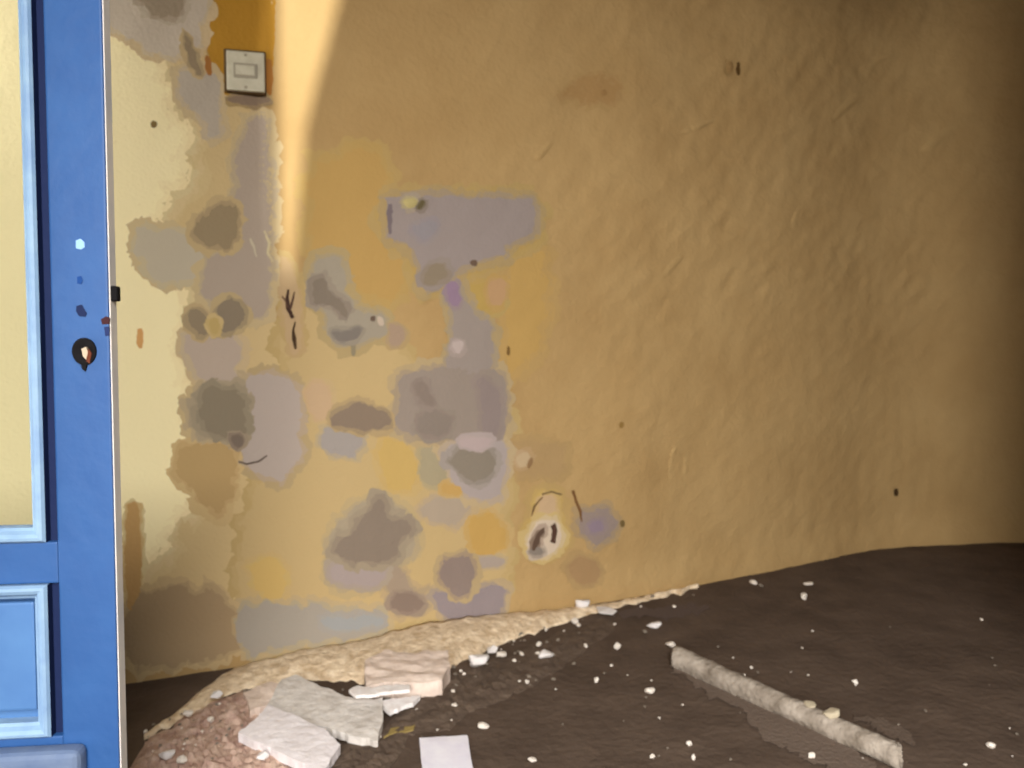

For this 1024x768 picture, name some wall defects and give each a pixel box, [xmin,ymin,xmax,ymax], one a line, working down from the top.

flaking render [109,0,395,492]
crack [282,289,297,349]
flaking render [377,184,547,374]
crack [239,455,267,465]
flaking render [413,432,537,534]
crack [531,490,582,522]
flaking render [233,481,576,662]
damp [124,575,244,683]